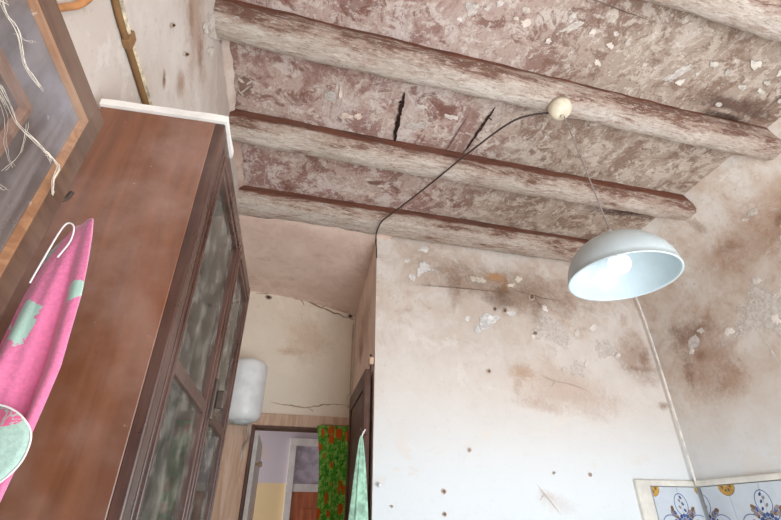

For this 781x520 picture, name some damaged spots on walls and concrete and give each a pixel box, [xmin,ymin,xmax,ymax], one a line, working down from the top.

crack [393,92,405,141]
crack [447,107,496,152]
peeling [409,246,433,281]
peeling [465,307,516,333]
crack [272,402,344,411]